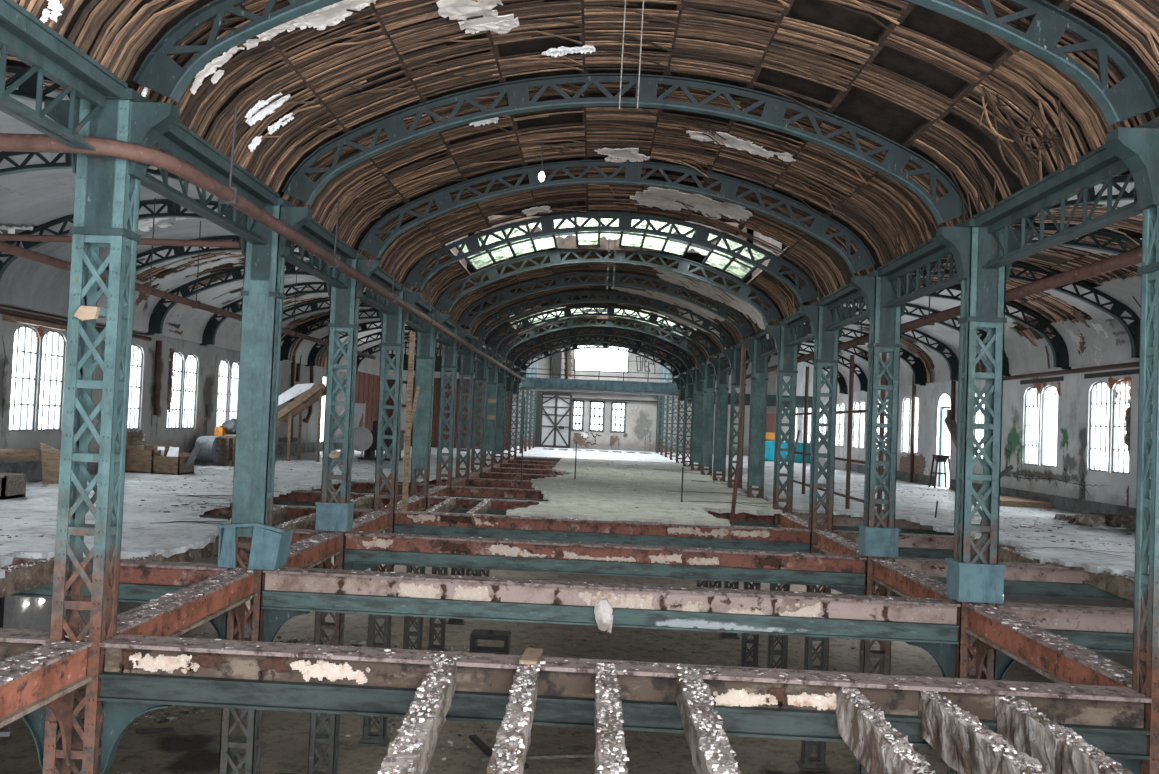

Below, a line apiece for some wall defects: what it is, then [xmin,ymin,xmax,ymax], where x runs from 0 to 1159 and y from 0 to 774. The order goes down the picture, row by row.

peeling [436,0,520,34]
peeling [190,0,376,95]
peeling [245,92,294,152]
peeling [686,130,796,162]
peeling [630,187,753,221]
rust [440,515,472,526]
rust [441,541,472,555]
rust [755,555,784,569]
peeling [129,652,200,674]
peeling [290,659,370,684]